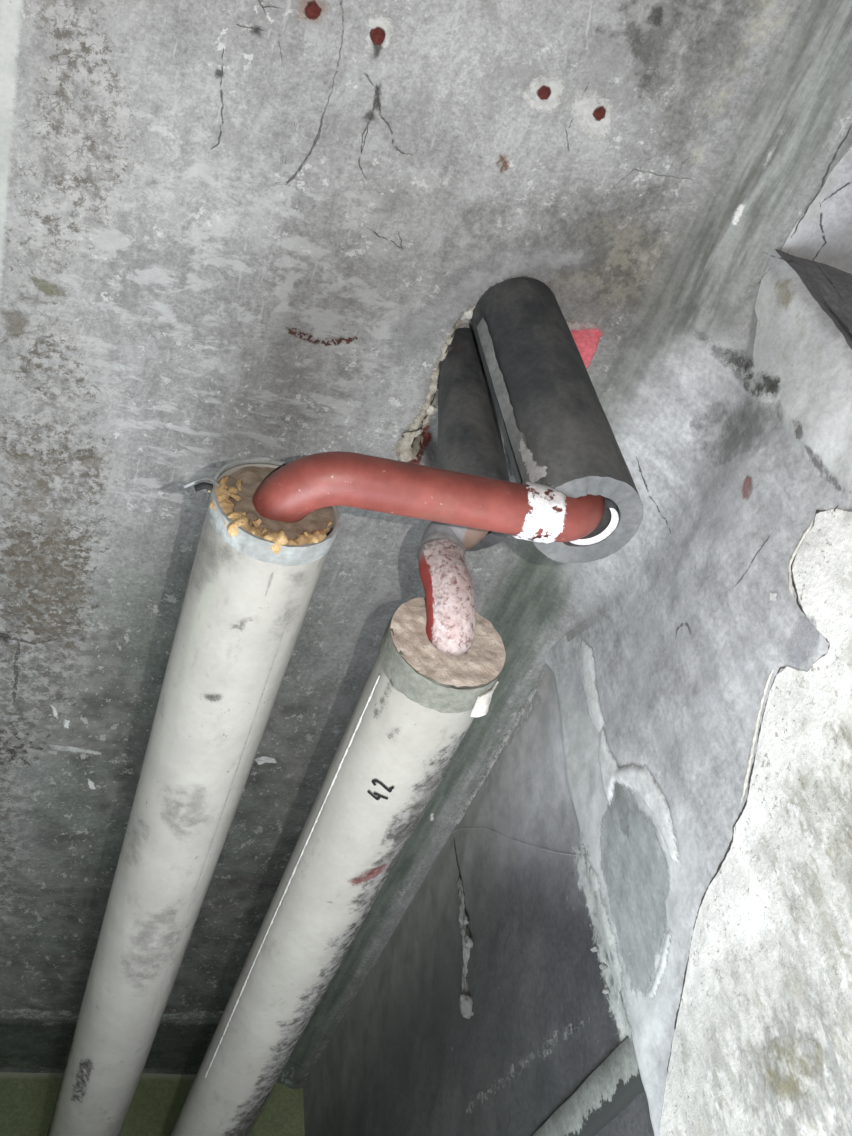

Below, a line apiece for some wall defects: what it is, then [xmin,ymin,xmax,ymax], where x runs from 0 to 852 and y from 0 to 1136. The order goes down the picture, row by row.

crack [275,0,413,185]
water stain [629,7,676,91]
crack [756,129,851,298]
flaking render [394,306,476,464]
mould [715,350,780,448]
crack [0,633,57,702]
peeling [659,508,852,1136]